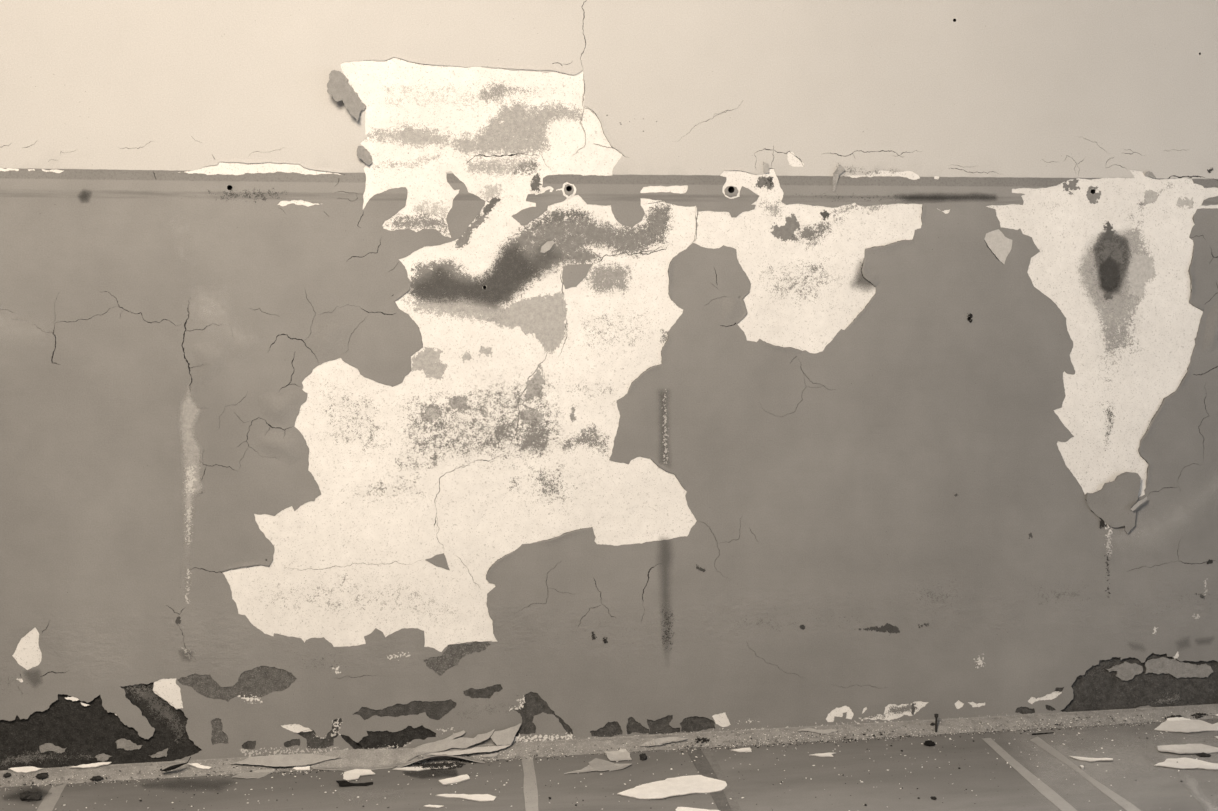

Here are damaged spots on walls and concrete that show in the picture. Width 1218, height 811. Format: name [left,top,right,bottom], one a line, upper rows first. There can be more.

crack [552,1,624,156]
peeling [178,157,346,175]
crack [466,153,552,171]
water stain [1090,221,1134,300]
crack [0,291,395,494]
peeling [220,51,950,676]
peeling [985,170,1218,534]
water stain [180,388,202,545]
spalling [0,666,297,773]
peeling [343,769,375,781]
spalling [281,684,503,749]
spalling [1015,653,1218,770]